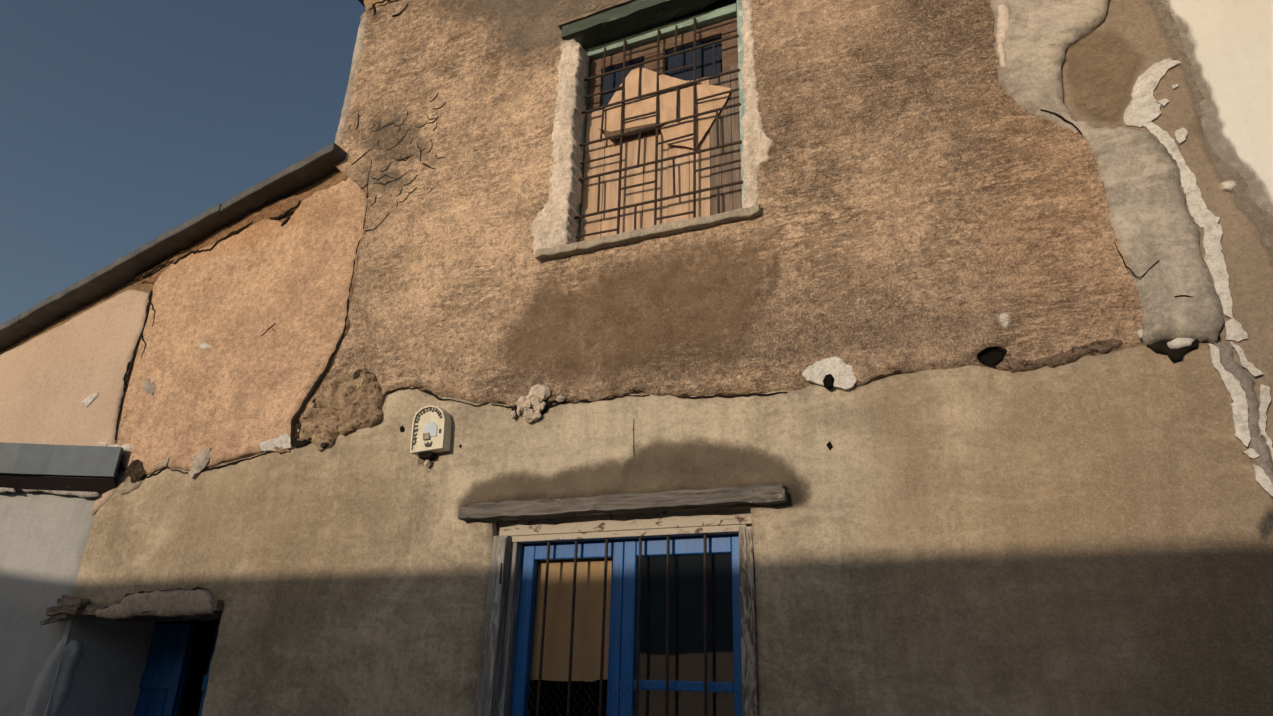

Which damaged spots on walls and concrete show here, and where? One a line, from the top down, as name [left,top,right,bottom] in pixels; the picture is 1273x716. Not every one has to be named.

crack [145,92,446,478]
water stain [507,241,776,378]
peeling [1137,122,1273,498]
crack [115,290,156,440]
spalling [293,367,385,451]
crack [384,387,511,408]
crack [549,392,787,455]
spalling [1009,339,1122,373]
spalling [95,590,215,619]